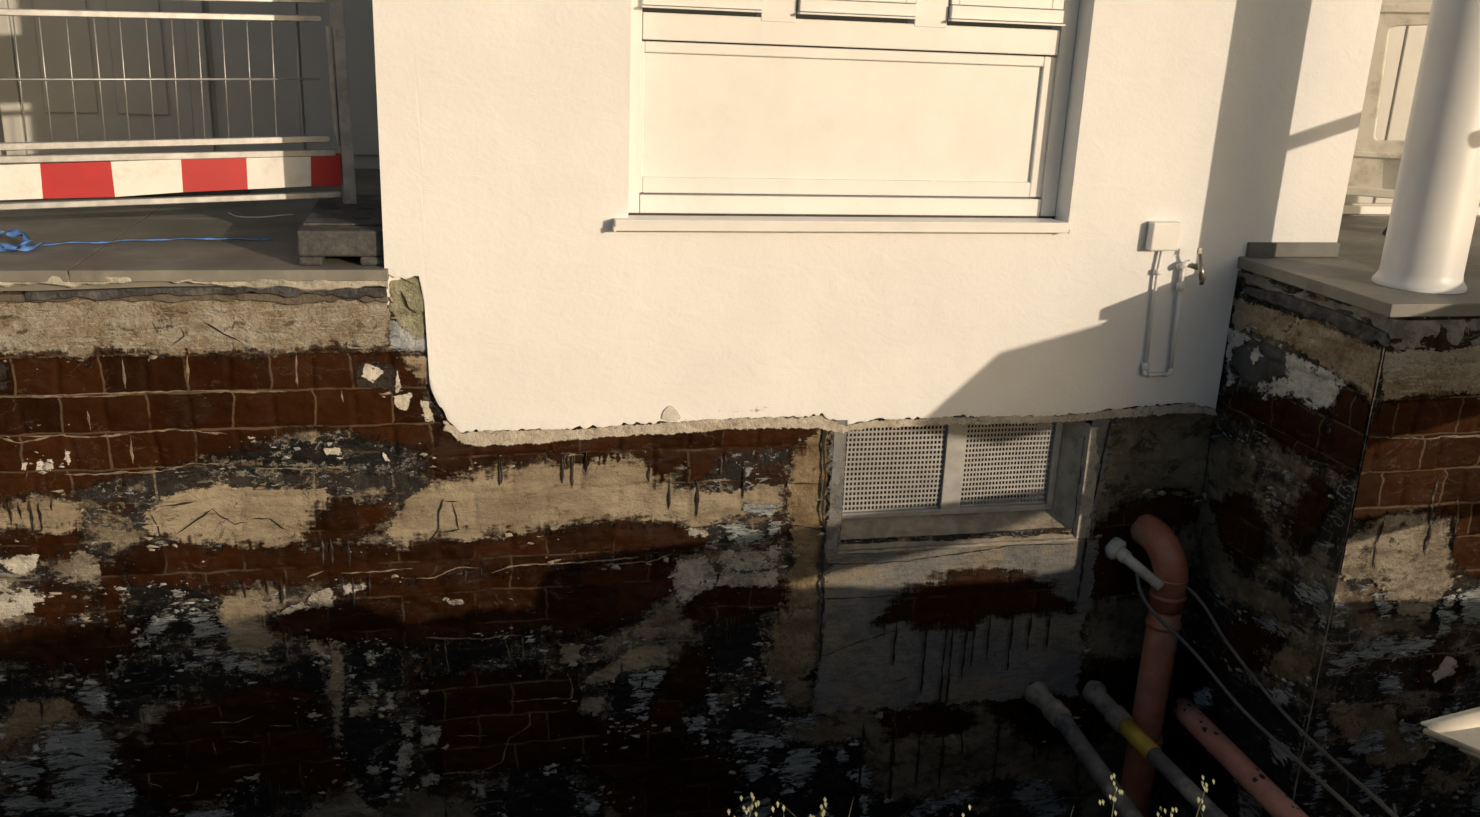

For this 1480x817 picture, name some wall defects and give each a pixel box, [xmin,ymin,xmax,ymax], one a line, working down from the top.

damp [0,339,826,817]
spalling [0,276,1480,817]
damp [870,487,1268,817]
damp [1217,611,1291,680]
damp [1222,383,1480,580]
damp [1414,641,1474,700]